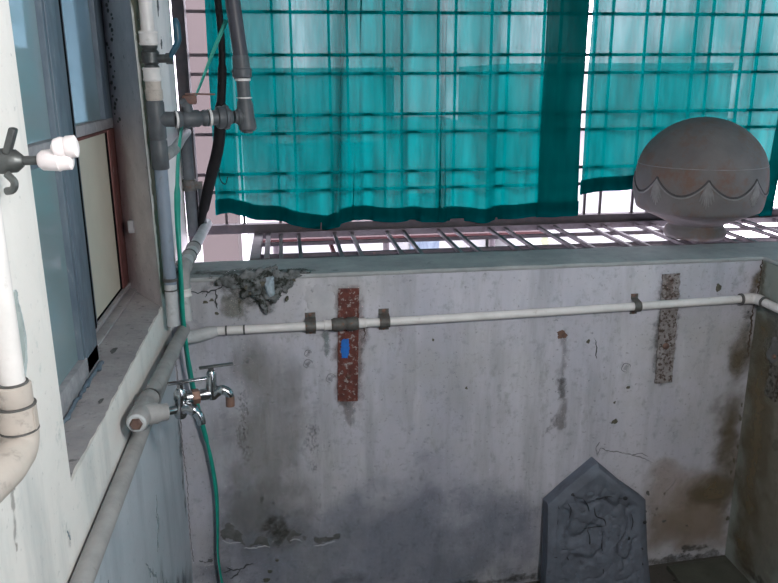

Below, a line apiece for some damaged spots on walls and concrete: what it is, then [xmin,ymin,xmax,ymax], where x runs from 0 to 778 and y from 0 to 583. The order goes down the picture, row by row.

spalling [215,264,311,315]
peeling [13,290,28,377]
water stain [646,320,778,583]
peeling [220,523,270,549]